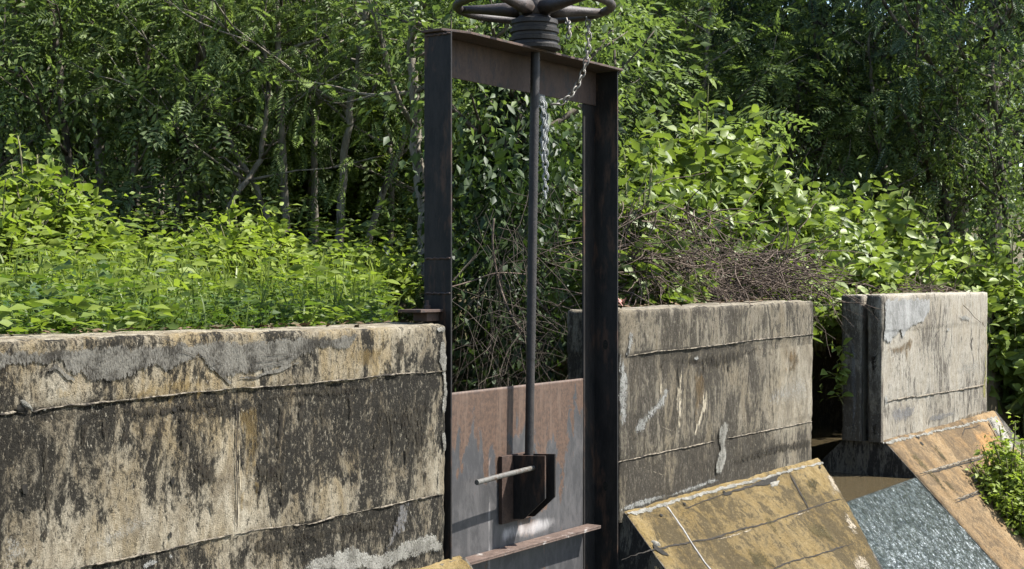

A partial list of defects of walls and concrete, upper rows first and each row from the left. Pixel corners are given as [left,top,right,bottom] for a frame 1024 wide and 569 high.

flaking render [884,298,930,343]
water stain [394,338,408,366]
water stain [618,333,758,435]
water stain [82,398,226,511]
water stain [730,440,811,464]
water stain [390,502,409,545]